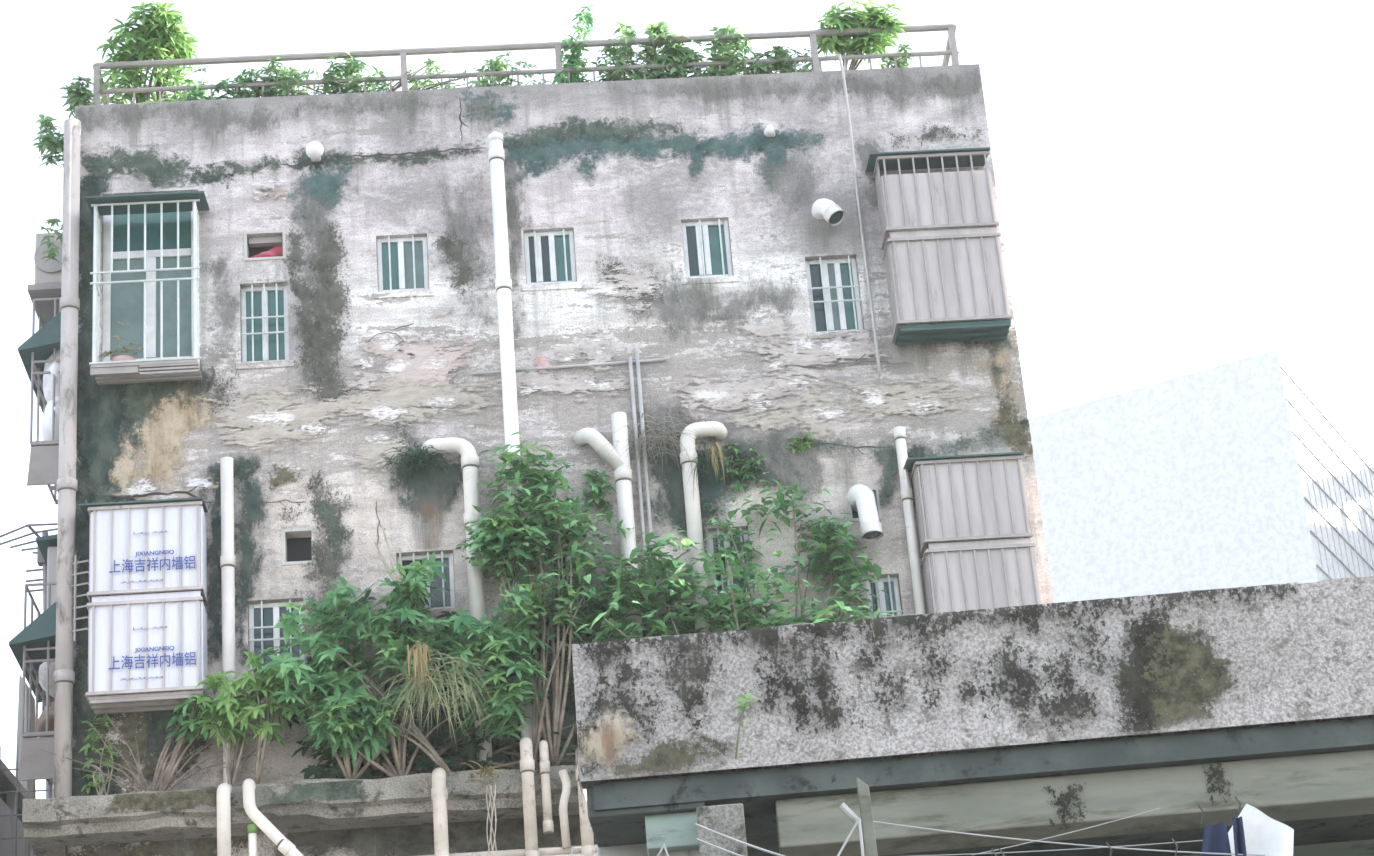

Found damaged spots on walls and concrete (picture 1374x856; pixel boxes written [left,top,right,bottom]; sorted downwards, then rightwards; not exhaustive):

water stain [178,258,241,422]
water stain [281,187,352,402]
water stain [431,177,493,326]
water stain [446,91,682,292]
water stain [689,145,705,177]
water stain [642,70,981,111]
water stain [857,123,984,206]
water stain [76,368,160,503]
spalling [111,475,219,501]
water stain [73,654,238,814]
water stain [274,582,1299,856]
water stain [68,835,249,856]